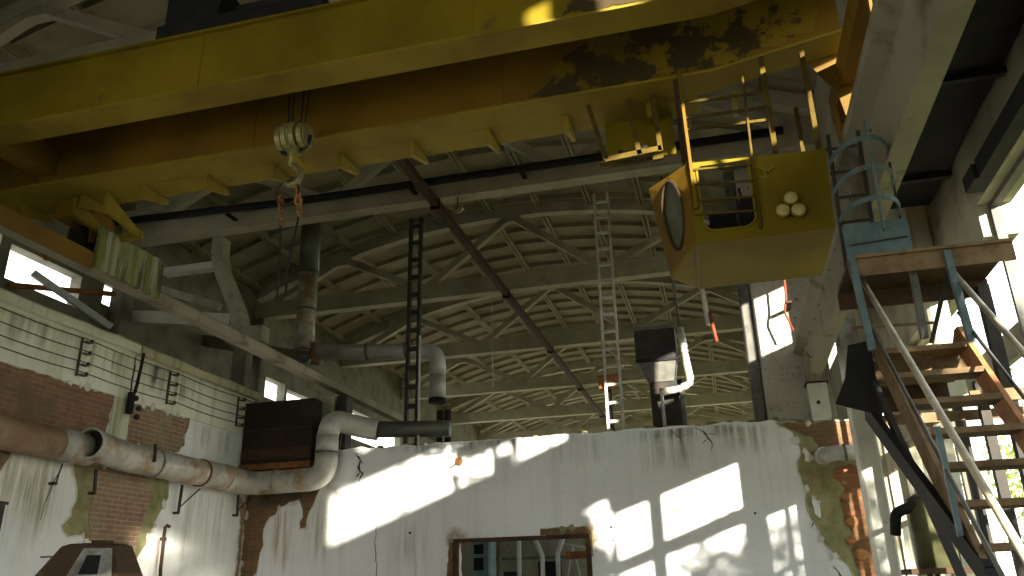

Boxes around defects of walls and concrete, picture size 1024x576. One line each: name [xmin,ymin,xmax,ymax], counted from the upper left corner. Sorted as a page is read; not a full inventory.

flaking render [0,361,114,432]
flaking render [0,450,12,473]
flaking render [125,399,190,454]
crack [355,452,364,481]
crack [671,428,713,450]
flaking render [775,418,876,576]
flaking render [234,486,325,576]